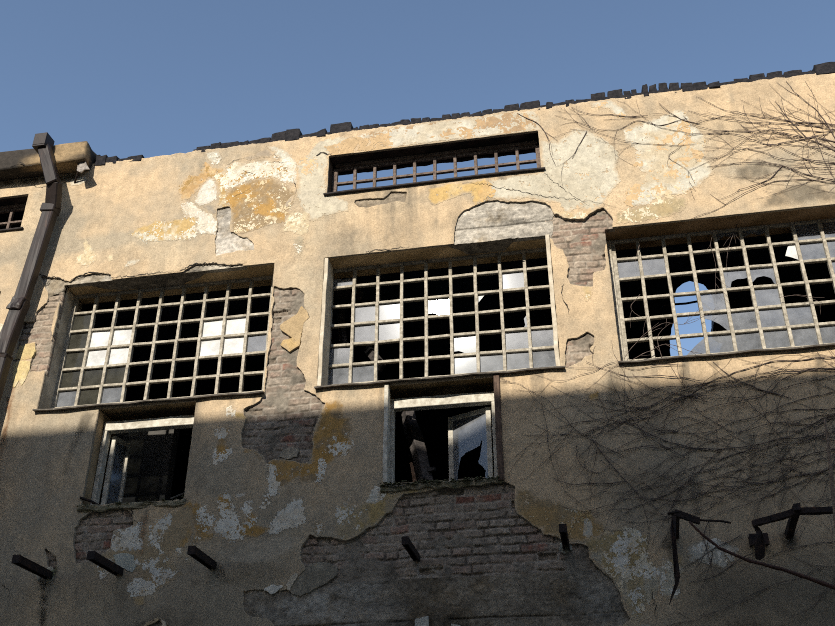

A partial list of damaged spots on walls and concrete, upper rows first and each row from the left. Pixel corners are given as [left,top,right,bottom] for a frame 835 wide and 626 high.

peeling [18,109,715,377]
peeling [590,100,627,118]
flaking render [74,287,355,597]
spalling [244,483,740,626]